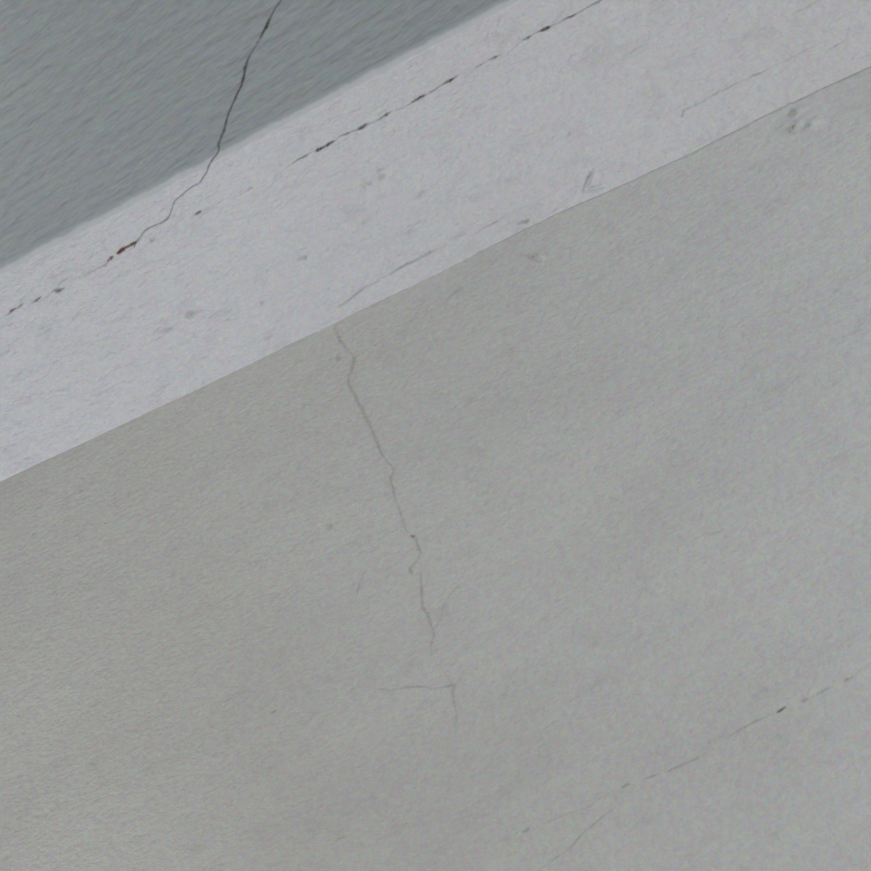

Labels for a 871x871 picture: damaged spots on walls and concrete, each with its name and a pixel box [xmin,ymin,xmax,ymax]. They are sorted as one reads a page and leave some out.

crack [110,241,136,259]